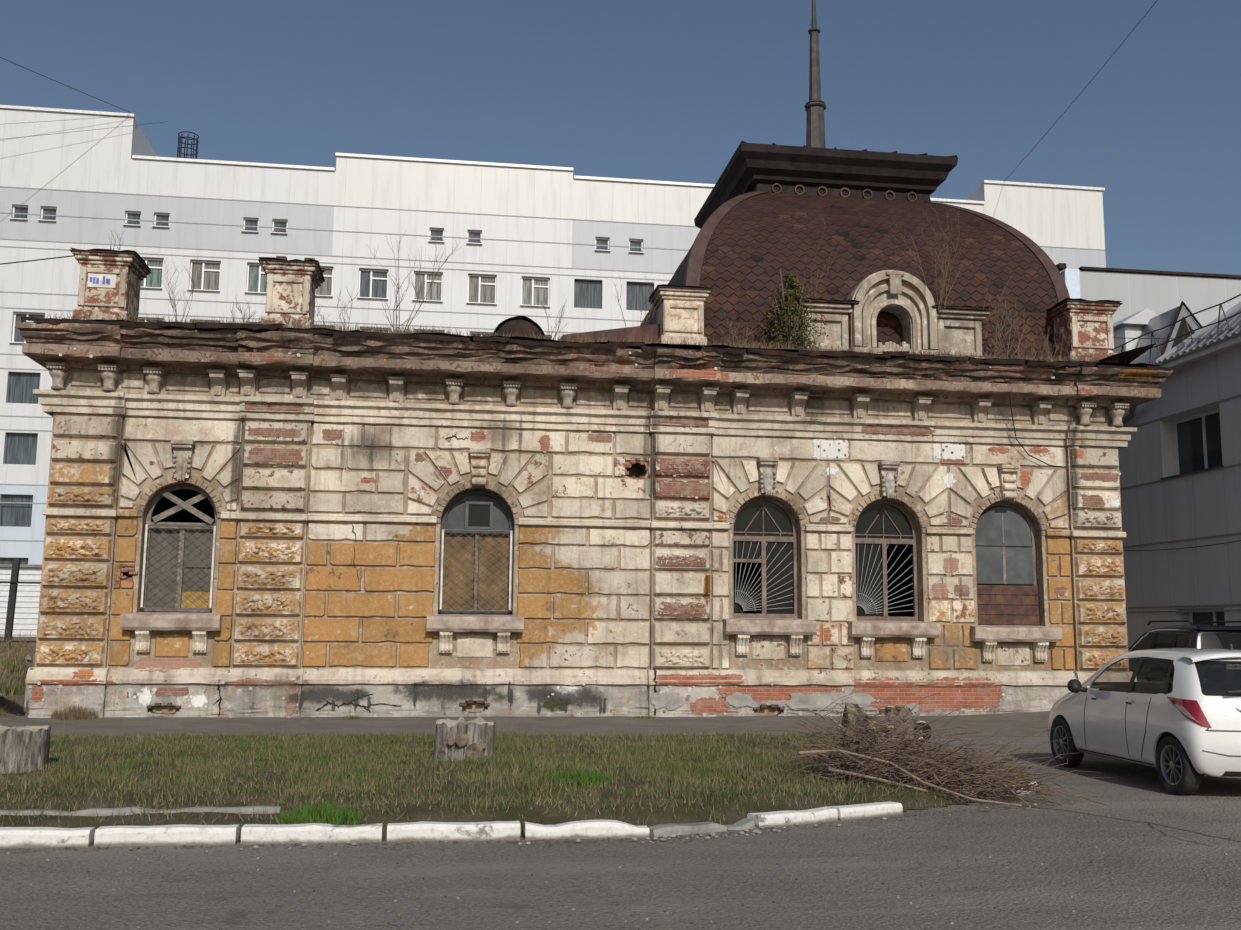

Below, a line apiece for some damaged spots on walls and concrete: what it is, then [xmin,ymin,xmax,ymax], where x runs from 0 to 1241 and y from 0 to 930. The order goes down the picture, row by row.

flaking render [236,349,301,363]
flaking render [623,458,709,499]
flaking render [1073,447,1121,511]
leakage [288,687,371,711]
leakage [395,681,606,714]
flaking render [655,673,1005,717]